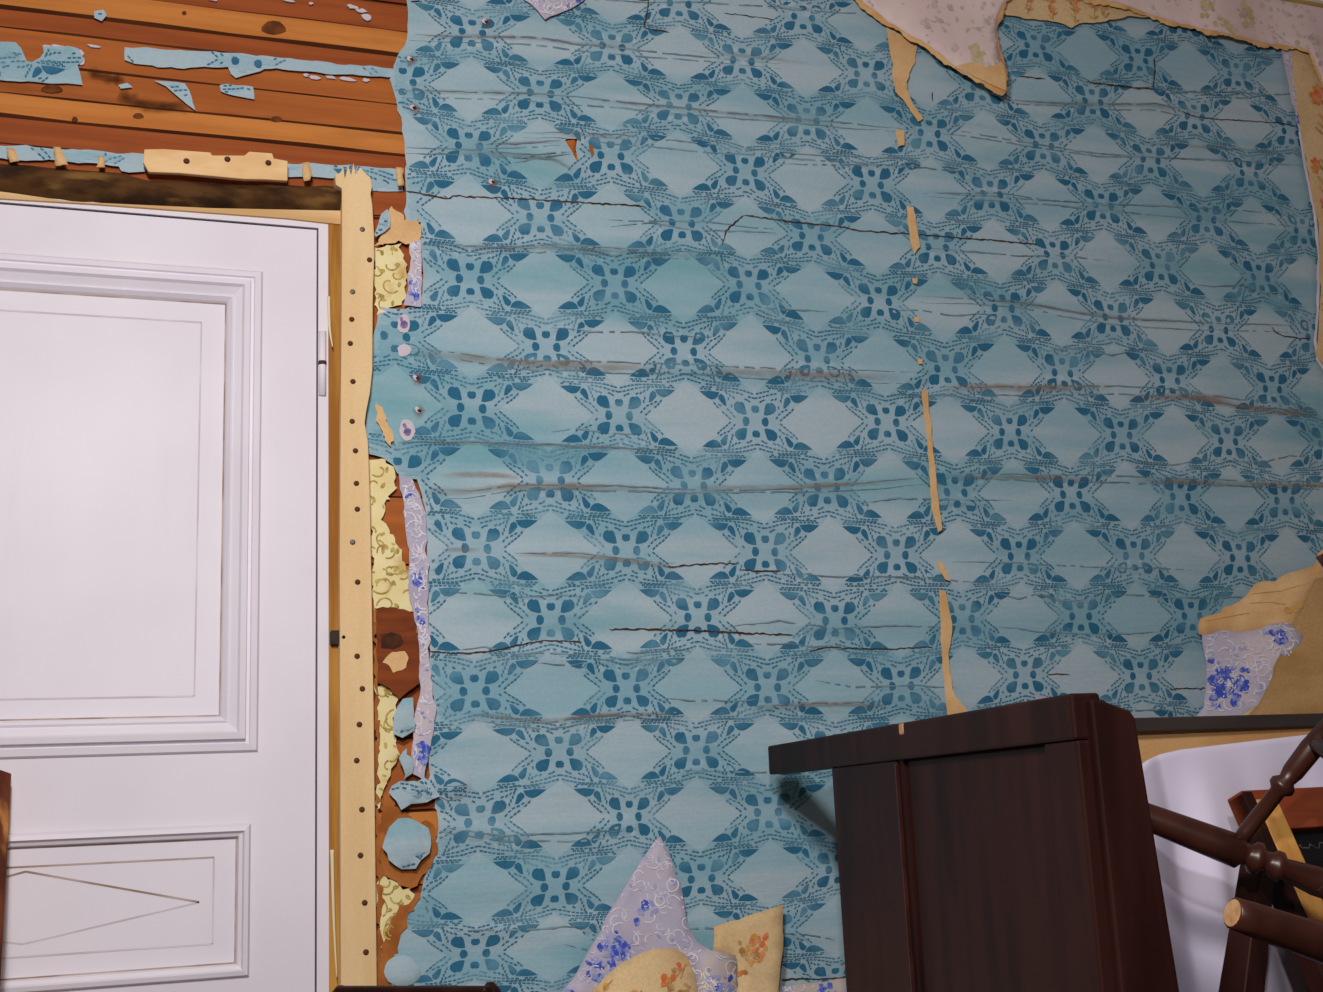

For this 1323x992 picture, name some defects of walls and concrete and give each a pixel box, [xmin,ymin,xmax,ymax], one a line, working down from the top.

peeling [307,75,370,83]
crack [407,191,643,207]
crack [722,215,1038,245]
peeling [382,651,408,673]